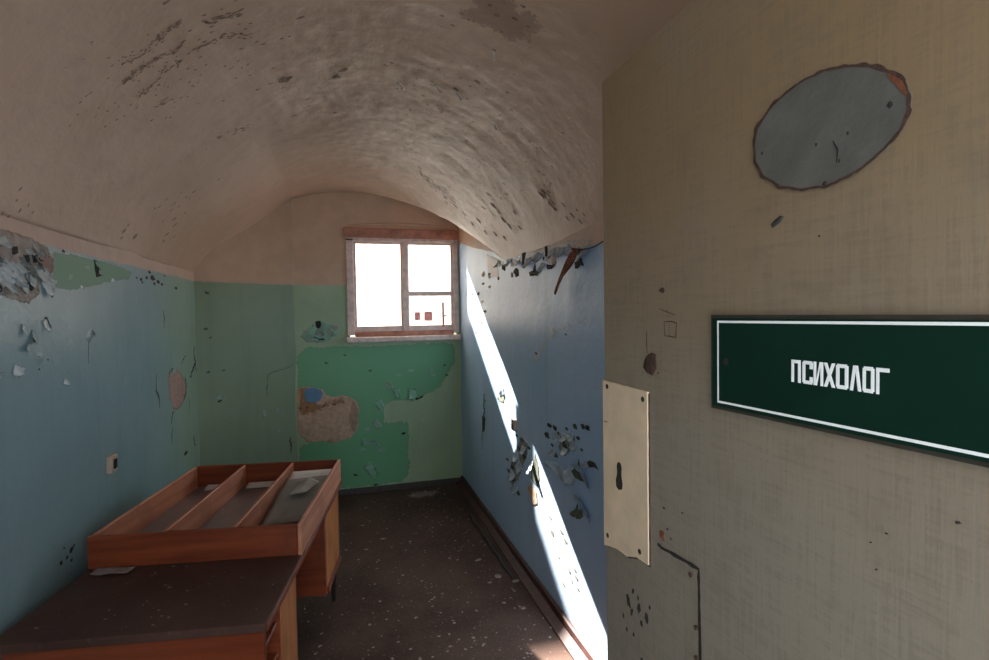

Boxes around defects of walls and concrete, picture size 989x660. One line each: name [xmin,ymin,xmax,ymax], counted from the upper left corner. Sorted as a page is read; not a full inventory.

peeling [0,229,65,304]
peeling [469,237,593,334]
peeling [301,320,339,343]
spalling [169,368,190,432]
spalling [296,386,359,443]
peeling [506,434,538,506]
peeling [544,423,590,486]